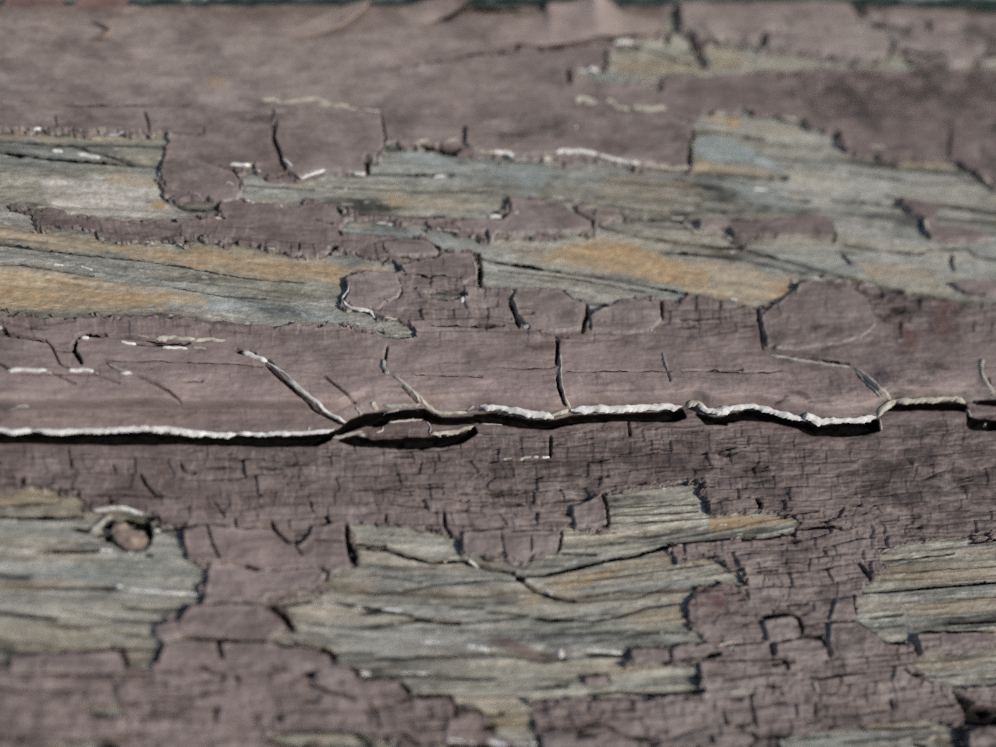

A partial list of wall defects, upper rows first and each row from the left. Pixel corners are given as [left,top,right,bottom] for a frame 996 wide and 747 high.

peeling [0,95,996,351]
crack [432,322,504,330]
crack [2,329,261,402]
crack [510,366,779,374]
crack [92,466,237,531]
crack [801,524,841,532]
peeling [0,479,996,747]
crack [135,668,240,722]
crack [306,674,499,747]